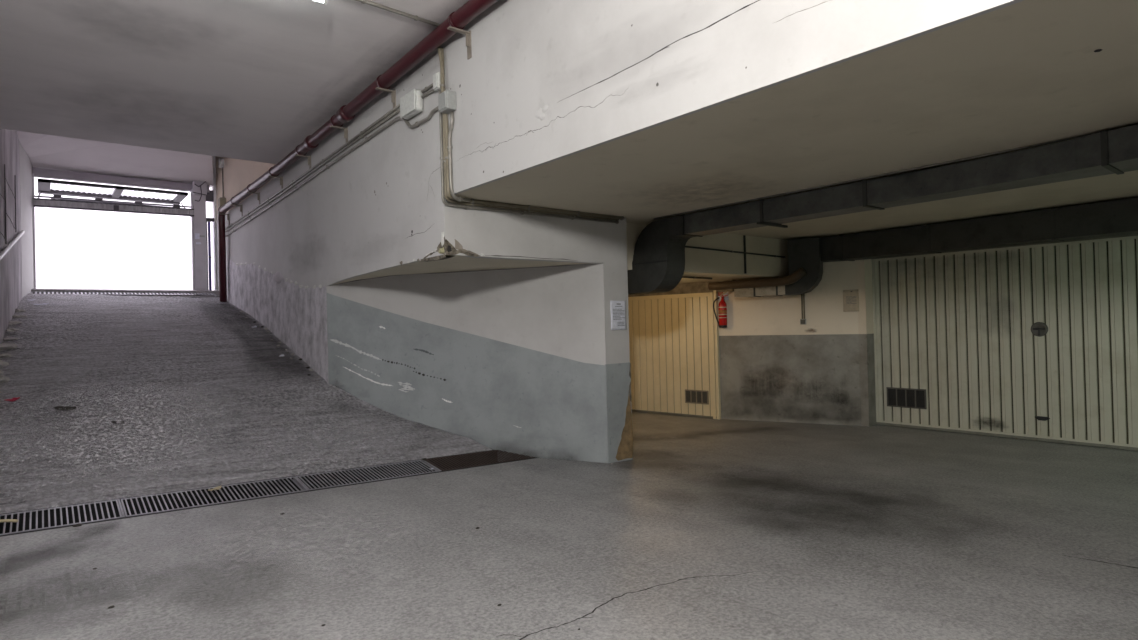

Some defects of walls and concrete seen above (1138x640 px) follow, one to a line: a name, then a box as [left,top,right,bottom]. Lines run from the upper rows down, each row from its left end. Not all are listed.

crack [427,0,827,197]
crack [500,572,749,640]